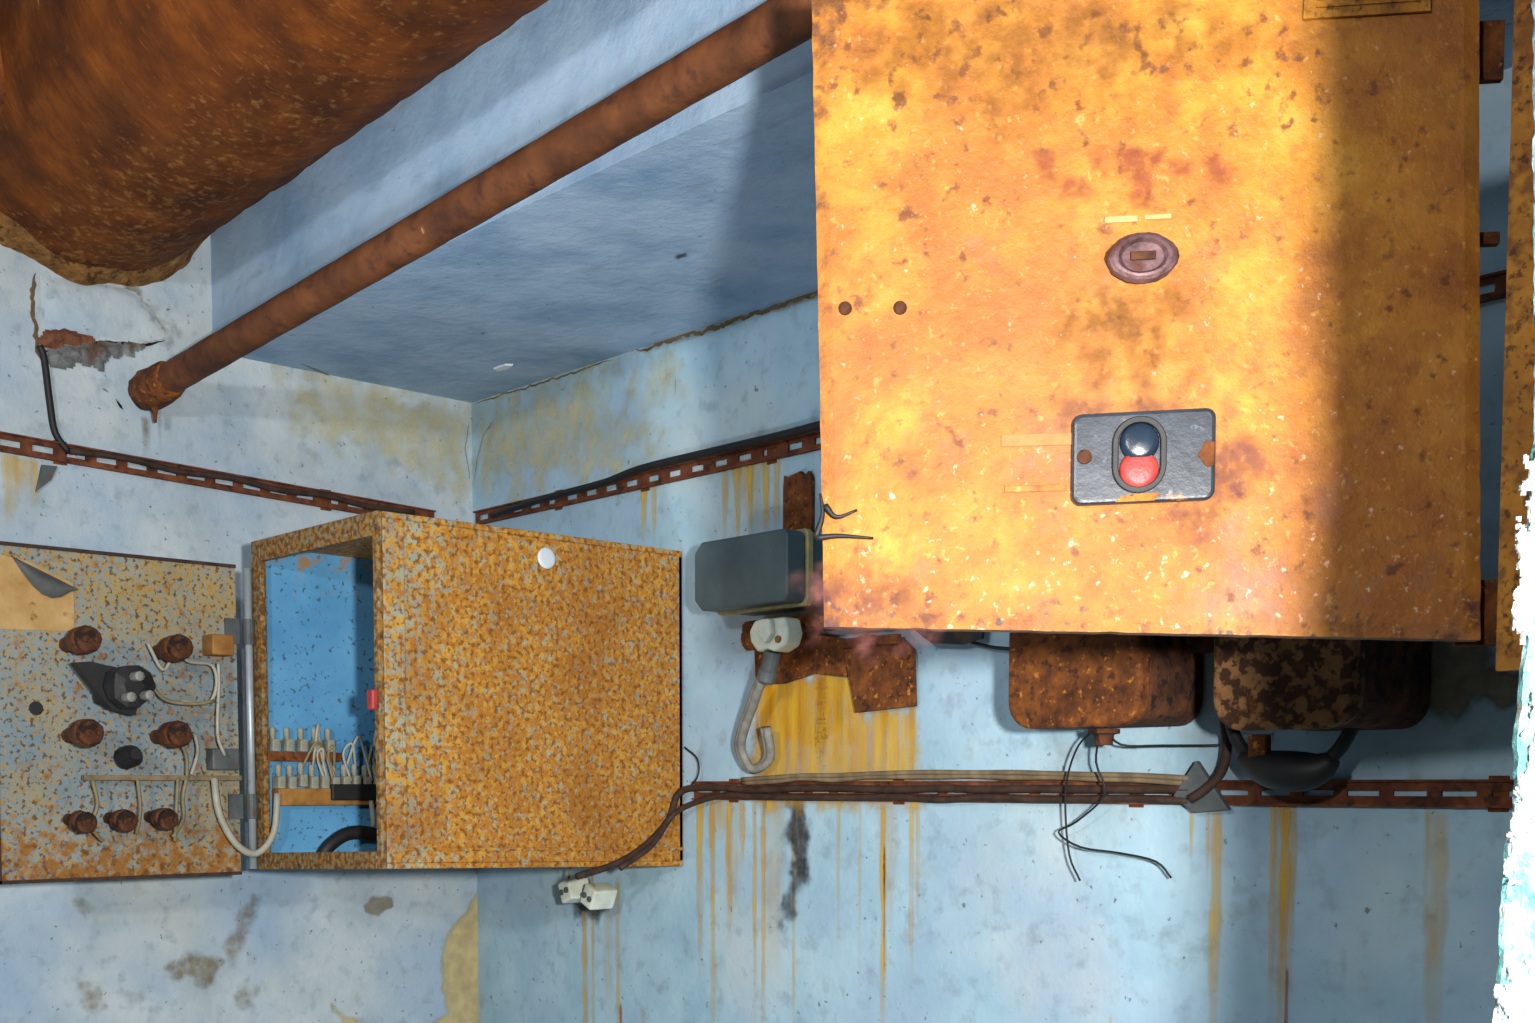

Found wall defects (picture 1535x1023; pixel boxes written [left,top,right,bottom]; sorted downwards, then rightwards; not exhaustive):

flaking render [29,273,168,410]
peeling [1511,454,1535,645]
rust [697,675,915,919]
flaking render [365,897,393,915]
peeling [436,895,479,1023]
rust [1272,807,1288,937]
peeling [1492,959,1535,1023]